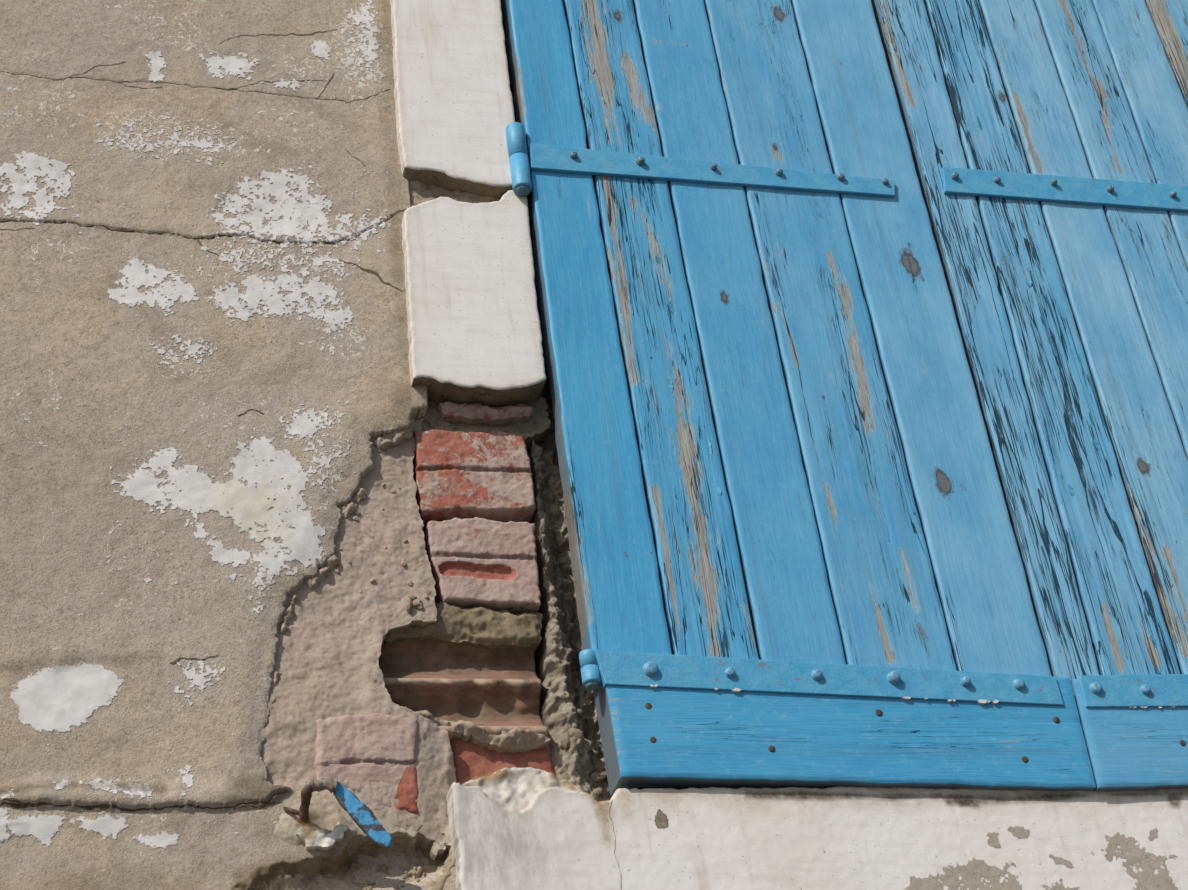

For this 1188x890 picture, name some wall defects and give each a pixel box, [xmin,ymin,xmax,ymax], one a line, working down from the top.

crack [221,29,336,43]
crack [0,61,389,102]
peeling [0,150,82,225]
crack [0,209,406,291]
peeling [107,164,396,339]
spalling [110,401,456,890]
peeling [10,662,124,734]
peeling [0,789,180,848]
crack [0,790,288,812]
peeling [905,858,1021,890]
peeling [987,826,1030,848]
peeling [1091,828,1178,890]